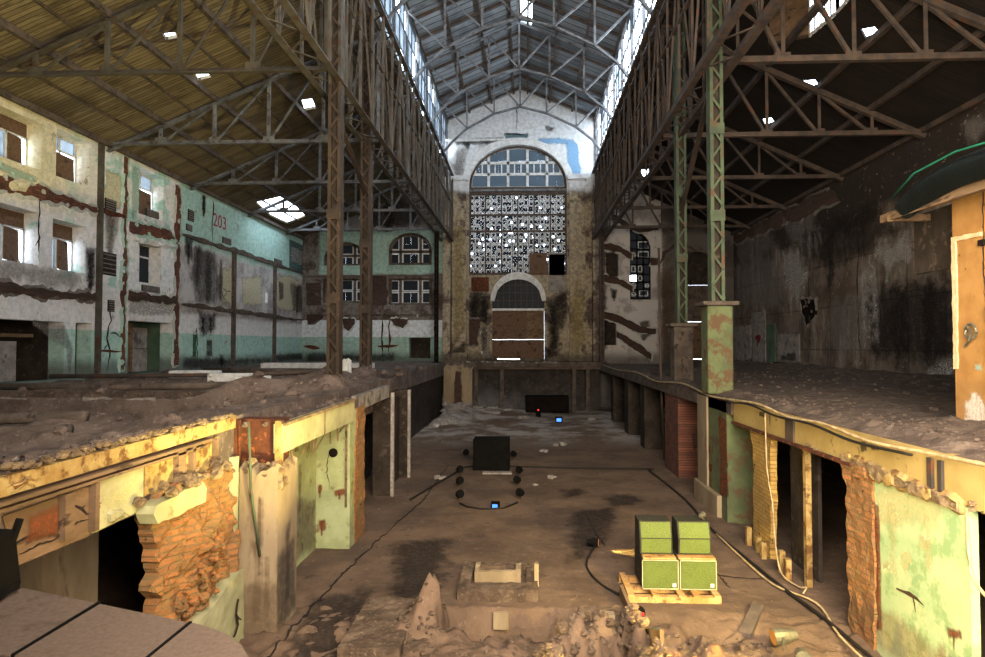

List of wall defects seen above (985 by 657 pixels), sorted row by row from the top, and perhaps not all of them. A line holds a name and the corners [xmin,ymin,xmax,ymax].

spalling [0,155,182,373]
damp [183,244,326,369]
damp [861,235,953,375]
spalling [289,439,317,567]
spalling [840,452,981,657]